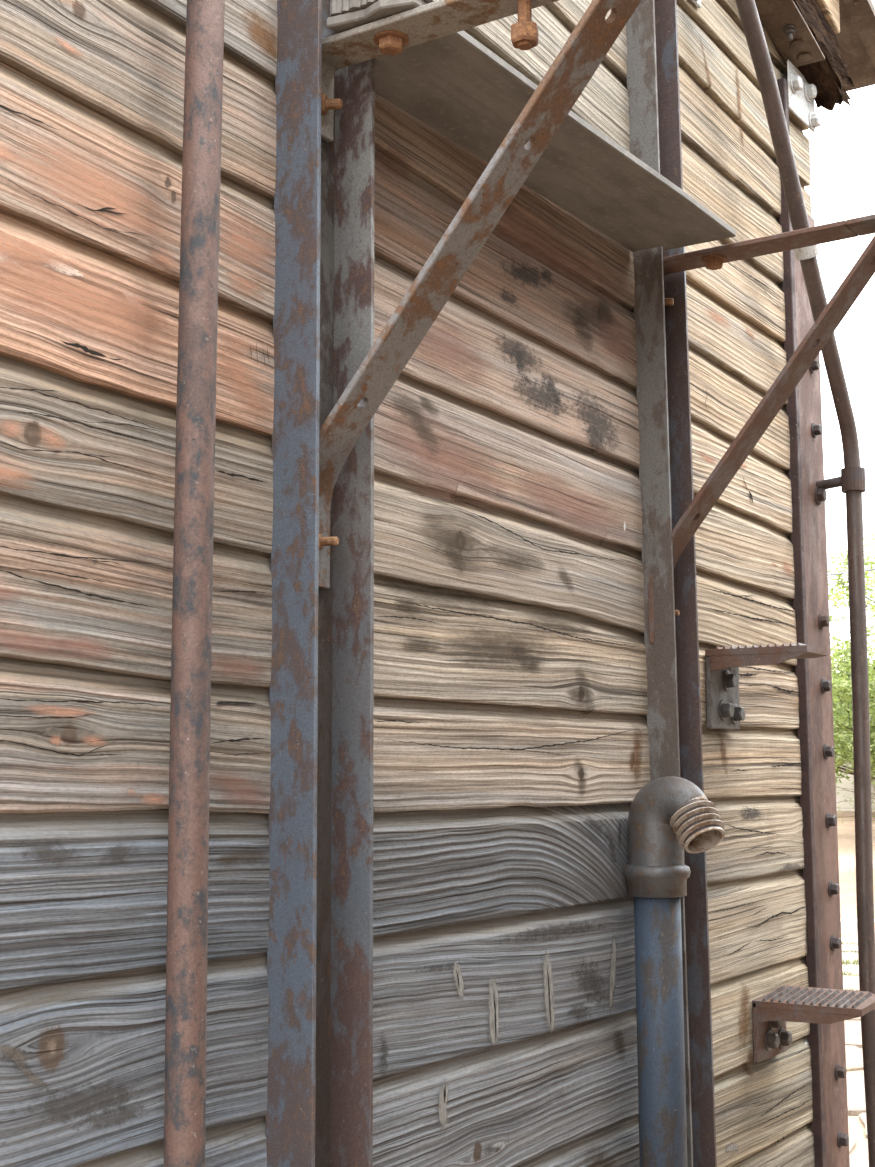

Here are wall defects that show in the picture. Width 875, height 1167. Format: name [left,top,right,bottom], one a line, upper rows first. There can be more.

corrosion [251,14,275,55]
water stain [501,265,552,306]
water stain [496,337,618,452]